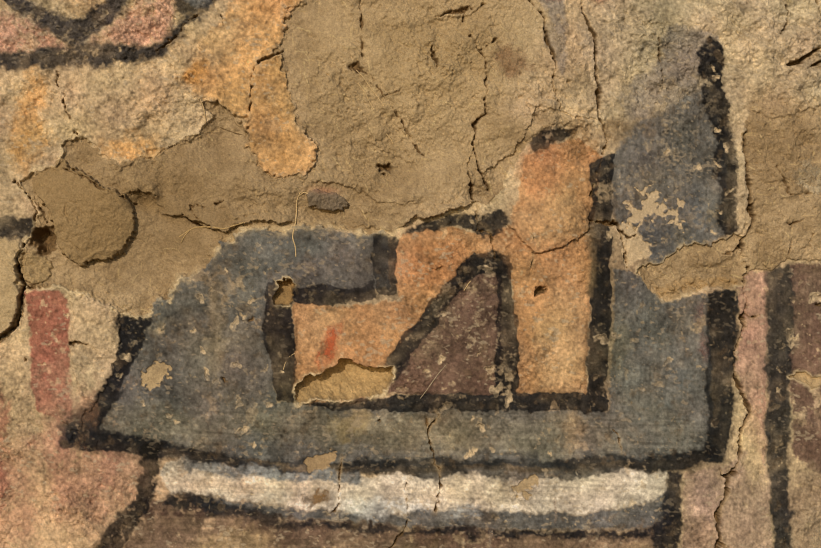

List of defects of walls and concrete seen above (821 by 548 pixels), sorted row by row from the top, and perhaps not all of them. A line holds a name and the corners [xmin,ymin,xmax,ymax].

spalling [0,0,607,335]
crack [435,3,498,259]
crack [528,0,561,109]
crack [581,0,608,197]
crack [786,47,821,67]
crack [0,243,41,340]
spalling [141,361,172,391]
spalling [291,358,394,409]
spalling [606,185,746,304]
crack [714,127,759,548]
flaking render [776,367,821,389]
spalling [303,449,337,473]